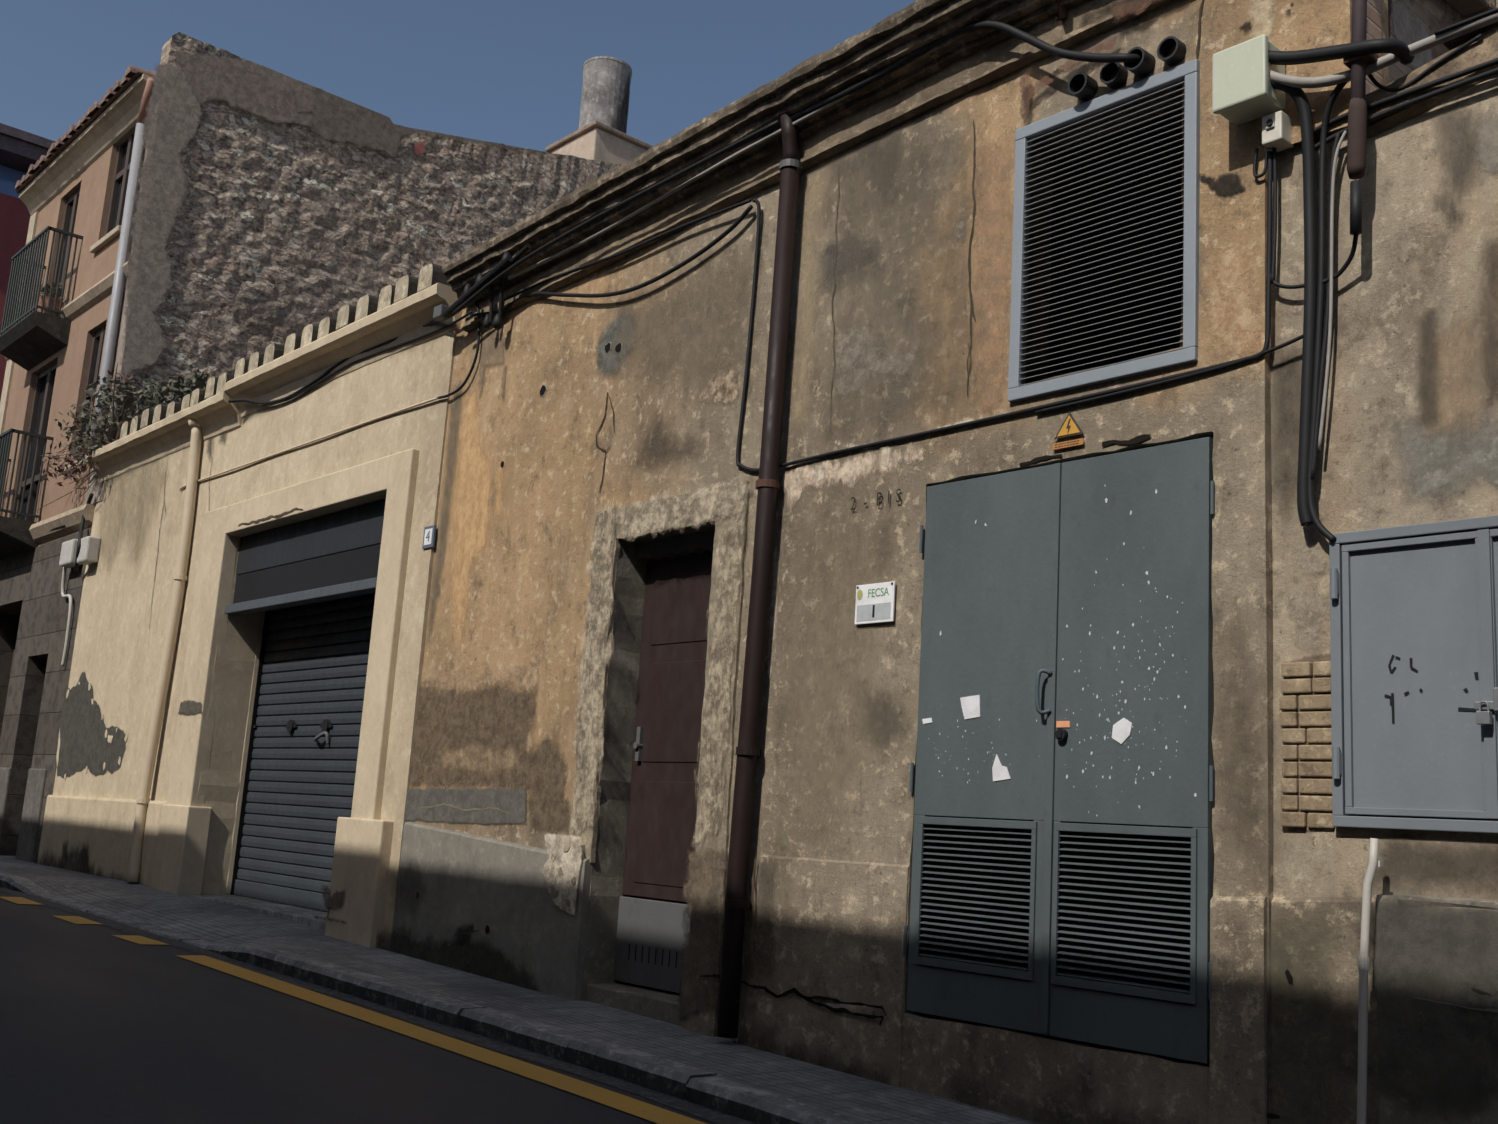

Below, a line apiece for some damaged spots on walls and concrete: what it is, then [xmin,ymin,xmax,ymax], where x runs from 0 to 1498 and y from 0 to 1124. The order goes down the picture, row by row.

damp [1440,114,1479,221]
damp [1421,257,1498,429]
peeling [56,672,128,780]
flaking render [409,476,750,1020]
crack [700,974,886,1026]
damp [1369,843,1498,1113]